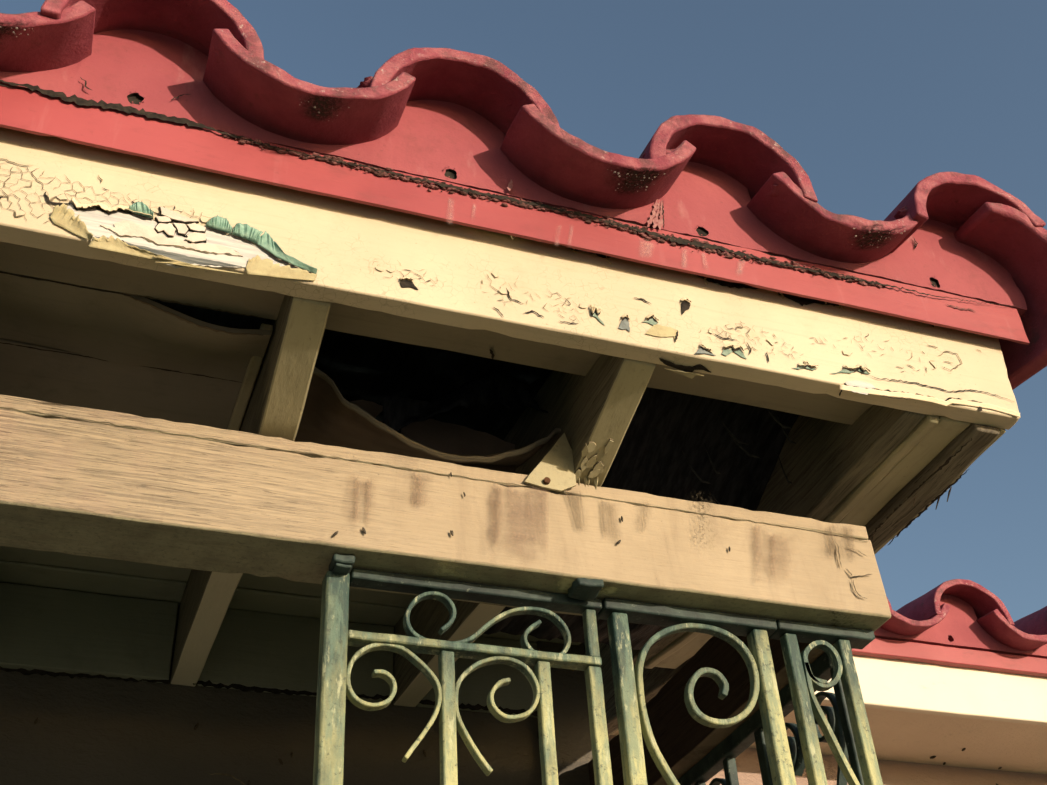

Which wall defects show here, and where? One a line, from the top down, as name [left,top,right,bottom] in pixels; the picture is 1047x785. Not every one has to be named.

damp [0,22,28,38]
crack [0,77,1023,312]
damp [614,167,659,193]
damp [647,199,664,230]
peeling [50,197,317,281]
damp [856,224,904,249]
crack [471,265,588,324]
peeling [680,298,691,314]
peeling [618,313,630,332]
peeling [643,314,678,342]
peeling [659,344,747,379]
crack [700,321,1021,418]